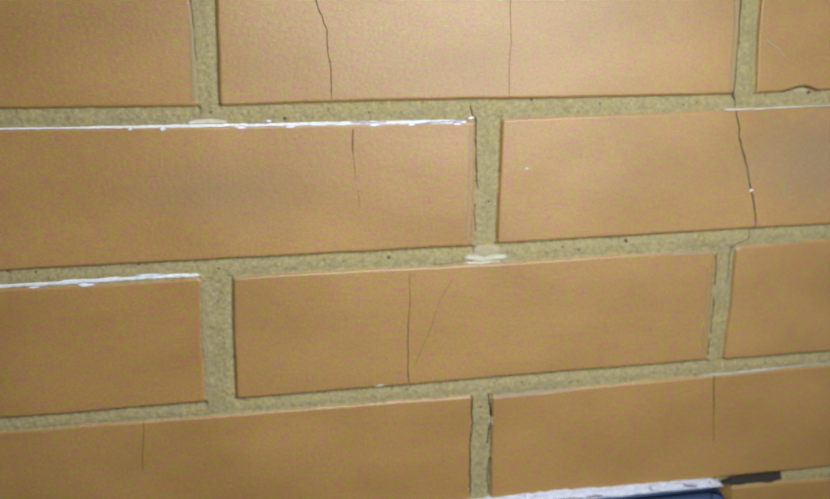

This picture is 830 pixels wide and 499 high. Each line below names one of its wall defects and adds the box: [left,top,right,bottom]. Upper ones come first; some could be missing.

crack [315,0,332,100]
crack [686,2,756,355]
crack [407,259,468,385]